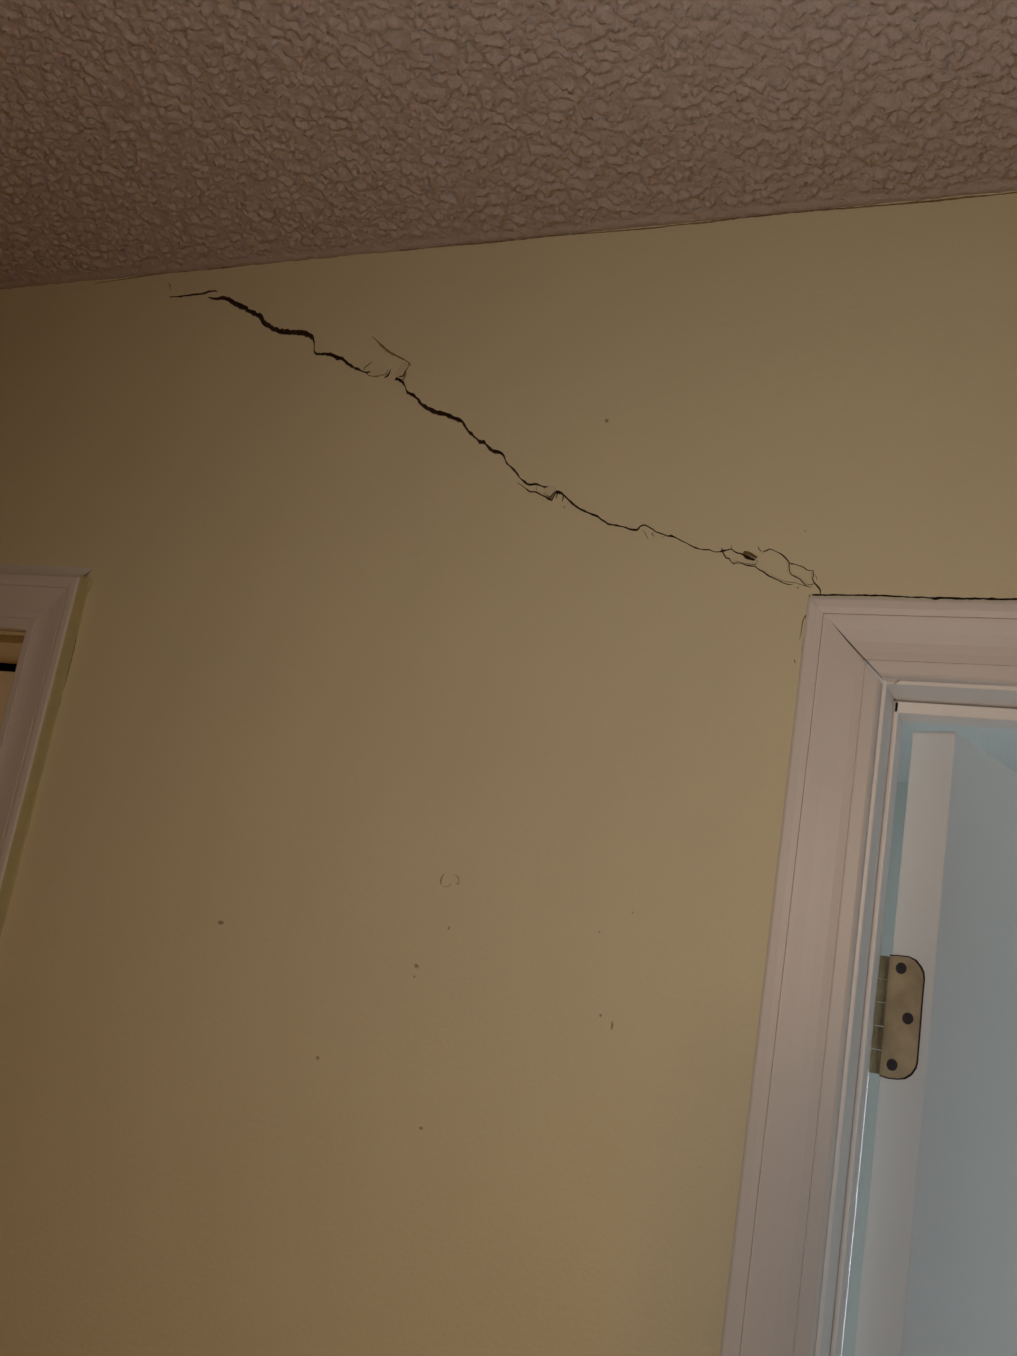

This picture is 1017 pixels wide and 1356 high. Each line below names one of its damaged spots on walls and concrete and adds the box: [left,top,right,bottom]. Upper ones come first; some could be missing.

crack [399,192,1017,251]
crack [99,266,1017,664]